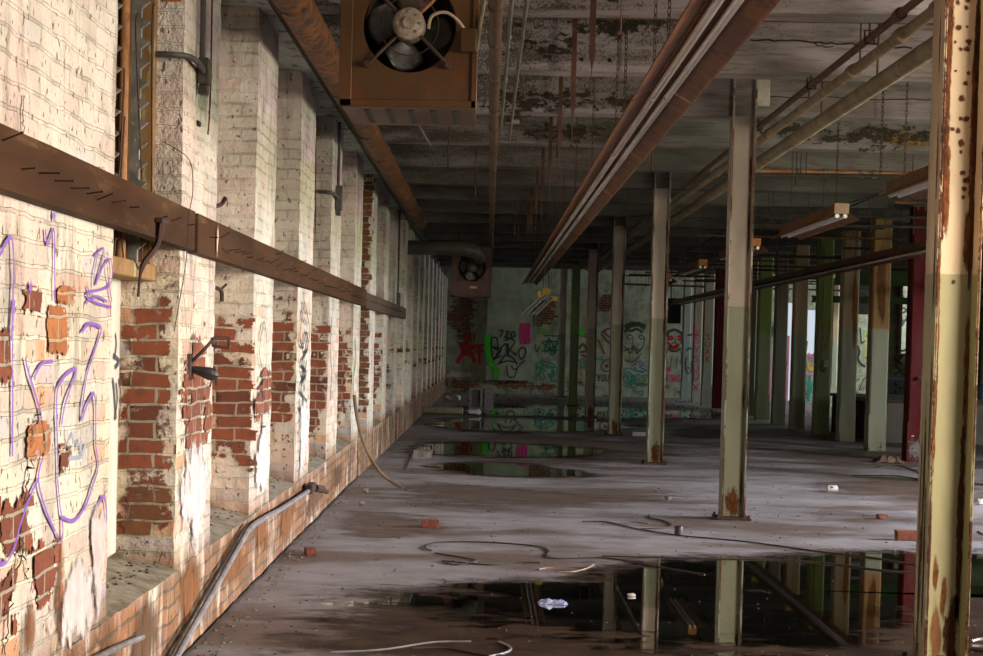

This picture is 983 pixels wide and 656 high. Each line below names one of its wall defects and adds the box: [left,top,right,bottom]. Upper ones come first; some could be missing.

leakage [804,123,930,152]
rust [747,130,756,251]
peeling [0,322,15,387]
peeling [24,284,76,359]
rust [916,0,983,656]
peeling [27,420,75,476]
peeling [116,292,296,542]
rust [723,442,742,515]
peeling [0,487,62,636]